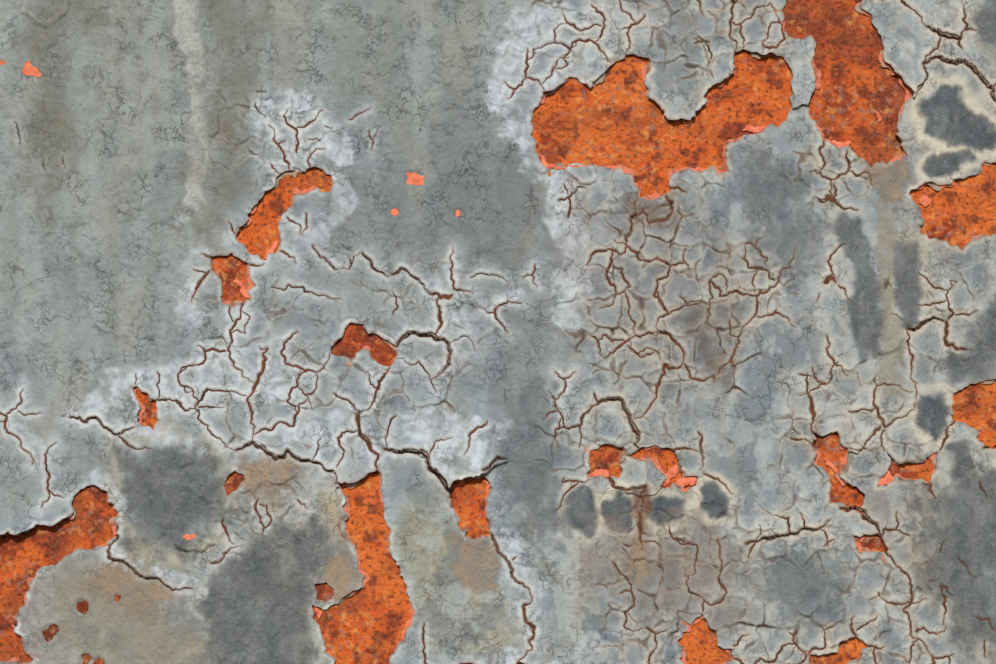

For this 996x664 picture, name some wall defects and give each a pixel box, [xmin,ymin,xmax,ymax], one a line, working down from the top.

peeling [531,0,926,198]
crack [901,0,996,102]
peeling [211,167,332,302]
crack [135,213,538,508]
crack [543,184,796,450]
rust [42,623,59,642]
peeling [0,485,118,663]
rust [76,600,89,615]
rust [81,653,105,664]
peeling [312,431,412,664]
peeling [386,420,508,539]
crack [733,505,953,664]